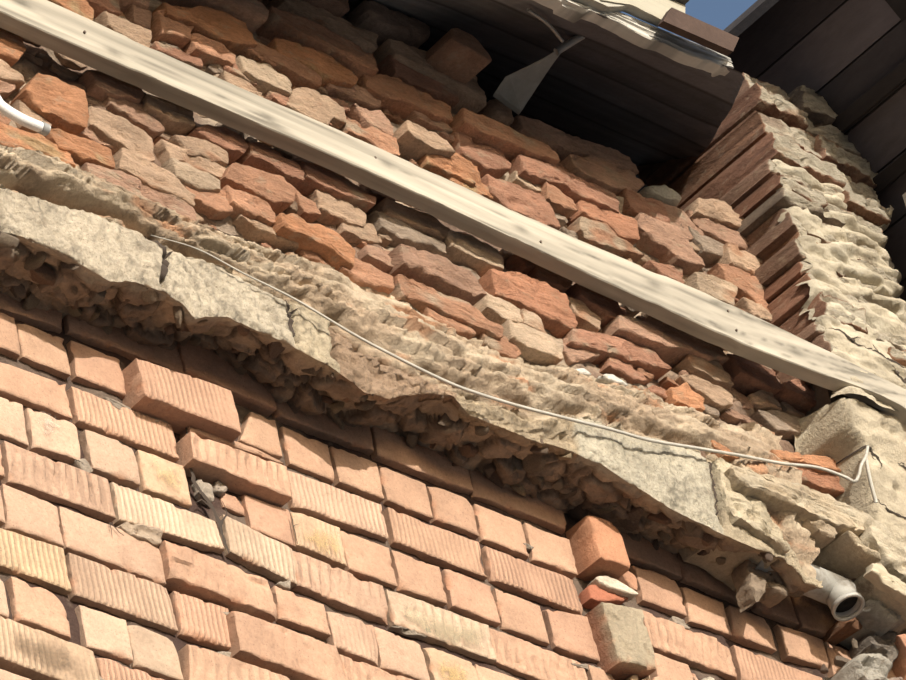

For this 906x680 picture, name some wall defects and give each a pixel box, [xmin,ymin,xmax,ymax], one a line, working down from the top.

crack [832,328,906,383]
spalling [0,230,906,633]
crack [836,445,906,468]